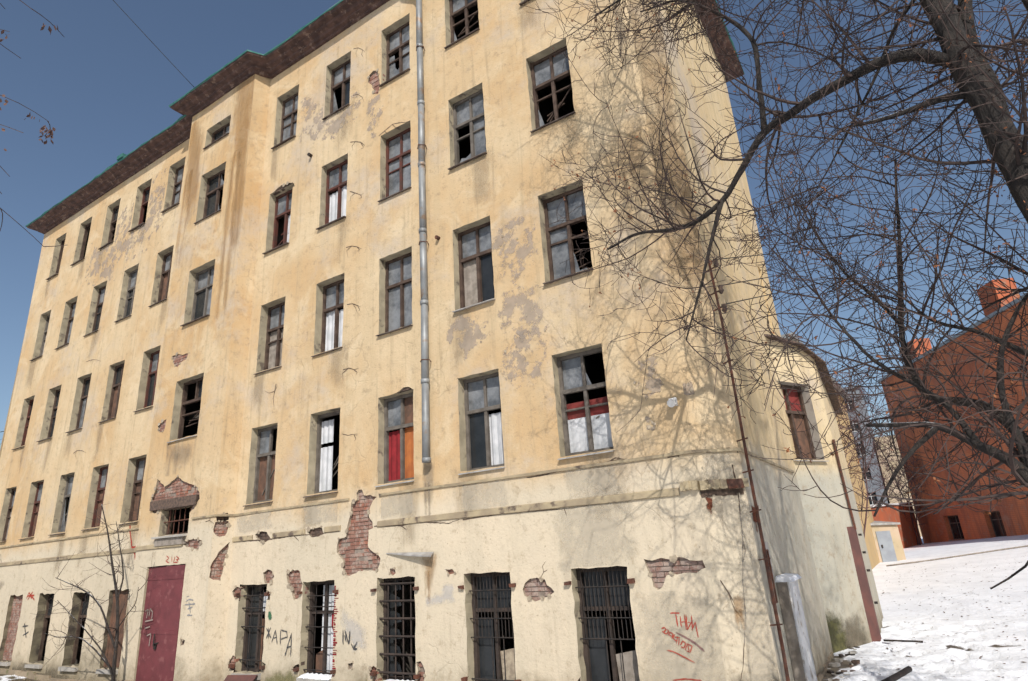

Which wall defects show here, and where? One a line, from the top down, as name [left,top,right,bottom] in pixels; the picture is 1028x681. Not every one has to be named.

peeling [302,68,385,141]
peeling [447,217,547,382]
spalling [151,475,199,514]
spalling [183,537,202,551]
spalling [209,512,231,581]
spalling [306,525,323,538]
spalling [337,489,396,576]
spalling [263,569,309,600]
spalling [523,577,554,602]
spalling [644,555,706,590]